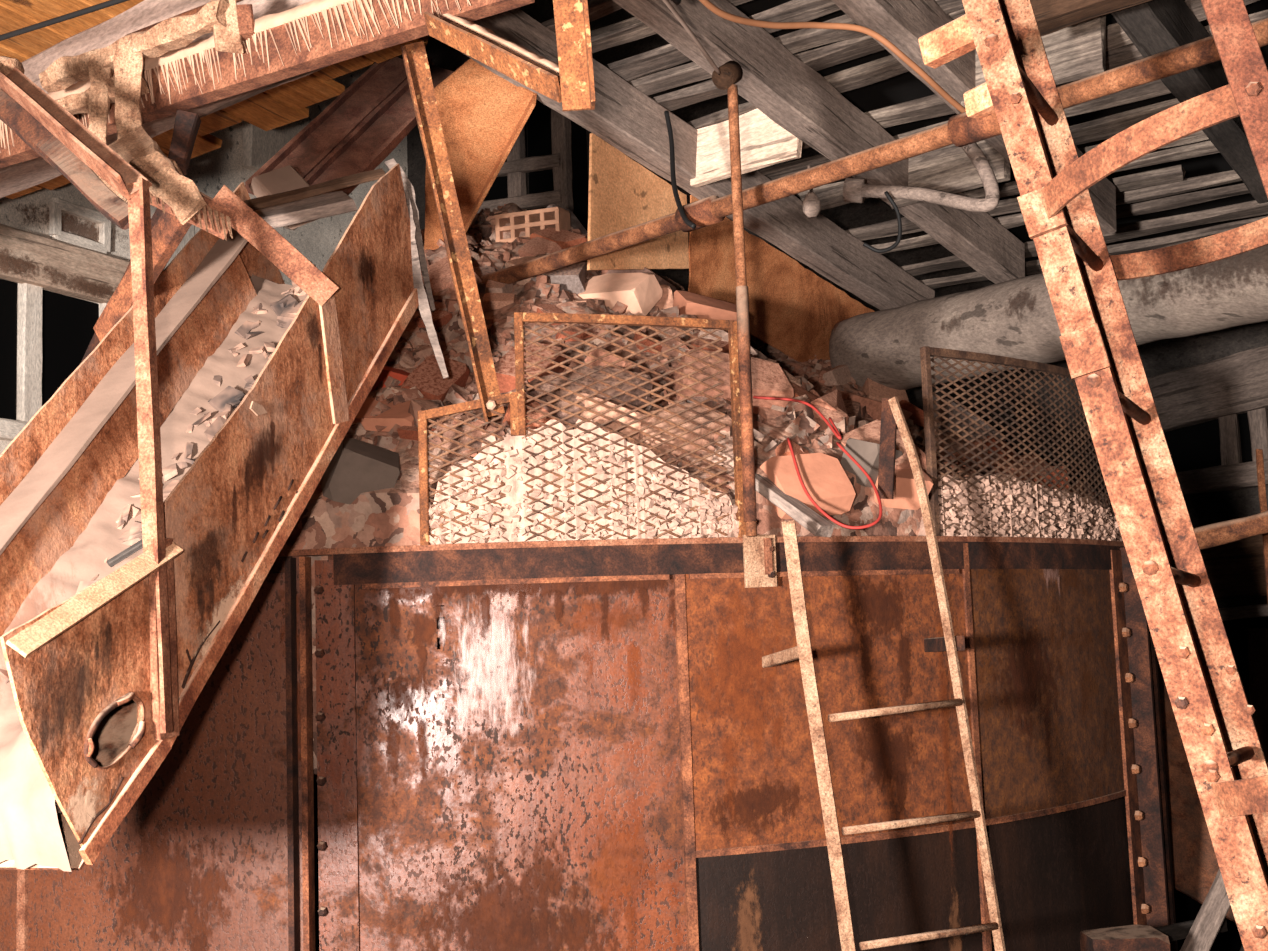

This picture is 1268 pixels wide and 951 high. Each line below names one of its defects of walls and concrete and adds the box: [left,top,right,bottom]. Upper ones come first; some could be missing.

corrosion [358,250,375,300]
corrosion [307,314,322,380]
corrosion [232,423,280,534]
corrosion [191,532,220,631]
corrosion [35,625,111,750]
corrosion [380,580,675,782]
corrosion [846,578,910,700]
corrosion [710,780,799,834]
corrosion [857,717,913,811]
corrosion [419,836,618,951]